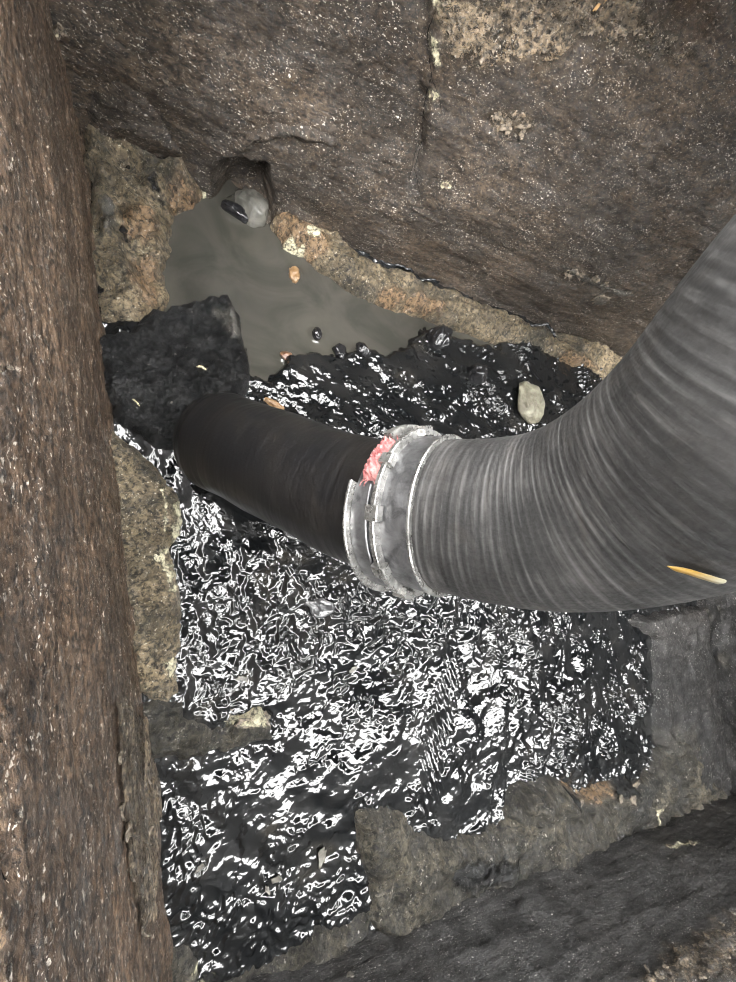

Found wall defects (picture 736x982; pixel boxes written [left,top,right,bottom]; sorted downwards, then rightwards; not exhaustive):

crack [409,7,441,195]